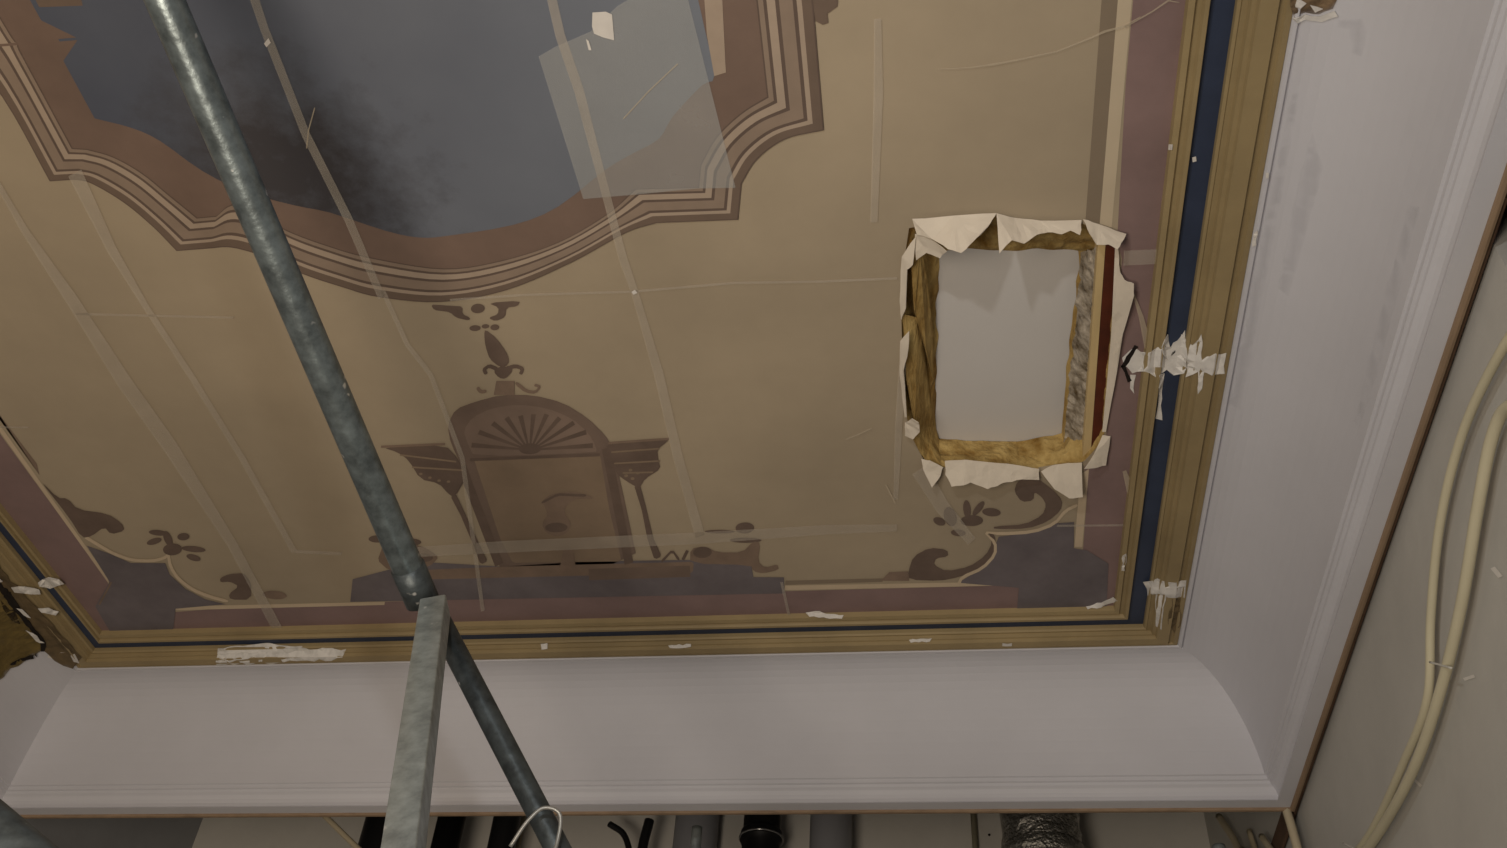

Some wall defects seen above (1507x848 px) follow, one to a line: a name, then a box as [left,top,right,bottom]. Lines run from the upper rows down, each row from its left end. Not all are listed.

spalling [1290,0,1338,23]
peeling [0,568,82,680]